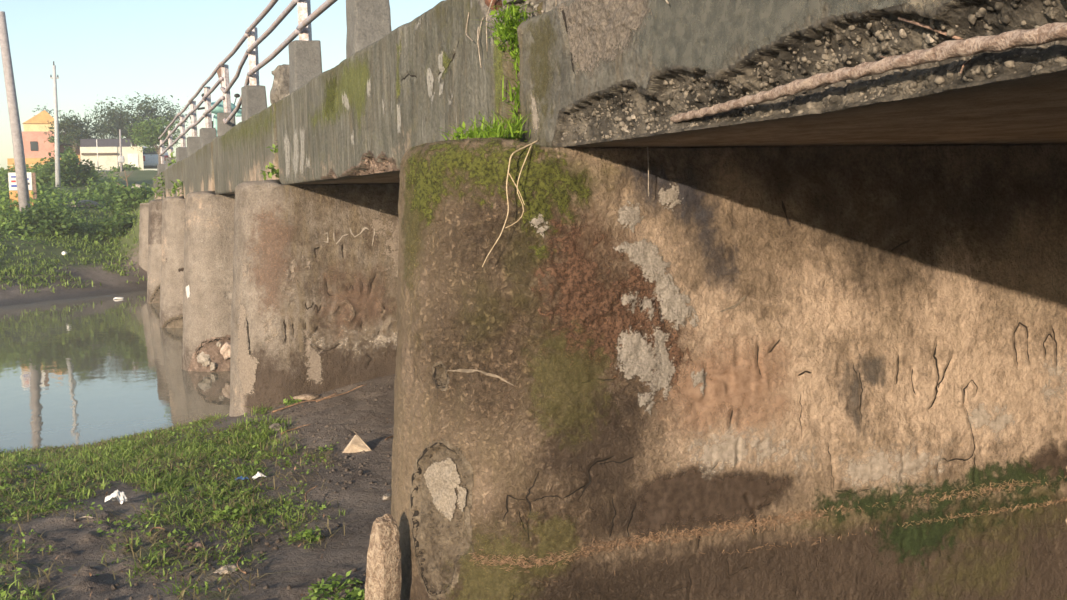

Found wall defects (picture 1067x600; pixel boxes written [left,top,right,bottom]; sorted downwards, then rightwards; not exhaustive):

spalling [551,0,1067,148]
peeling [529,213,550,238]
peeling [658,183,683,212]
leakage [626,157,735,281]
spalling [188,292,259,399]
peeling [301,328,324,384]
peeling [613,200,699,415]
spalling [364,438,474,600]
crack [503,456,636,539]
leakage [636,427,807,536]
leakage [839,450,942,485]
leakage [1019,443,1067,480]